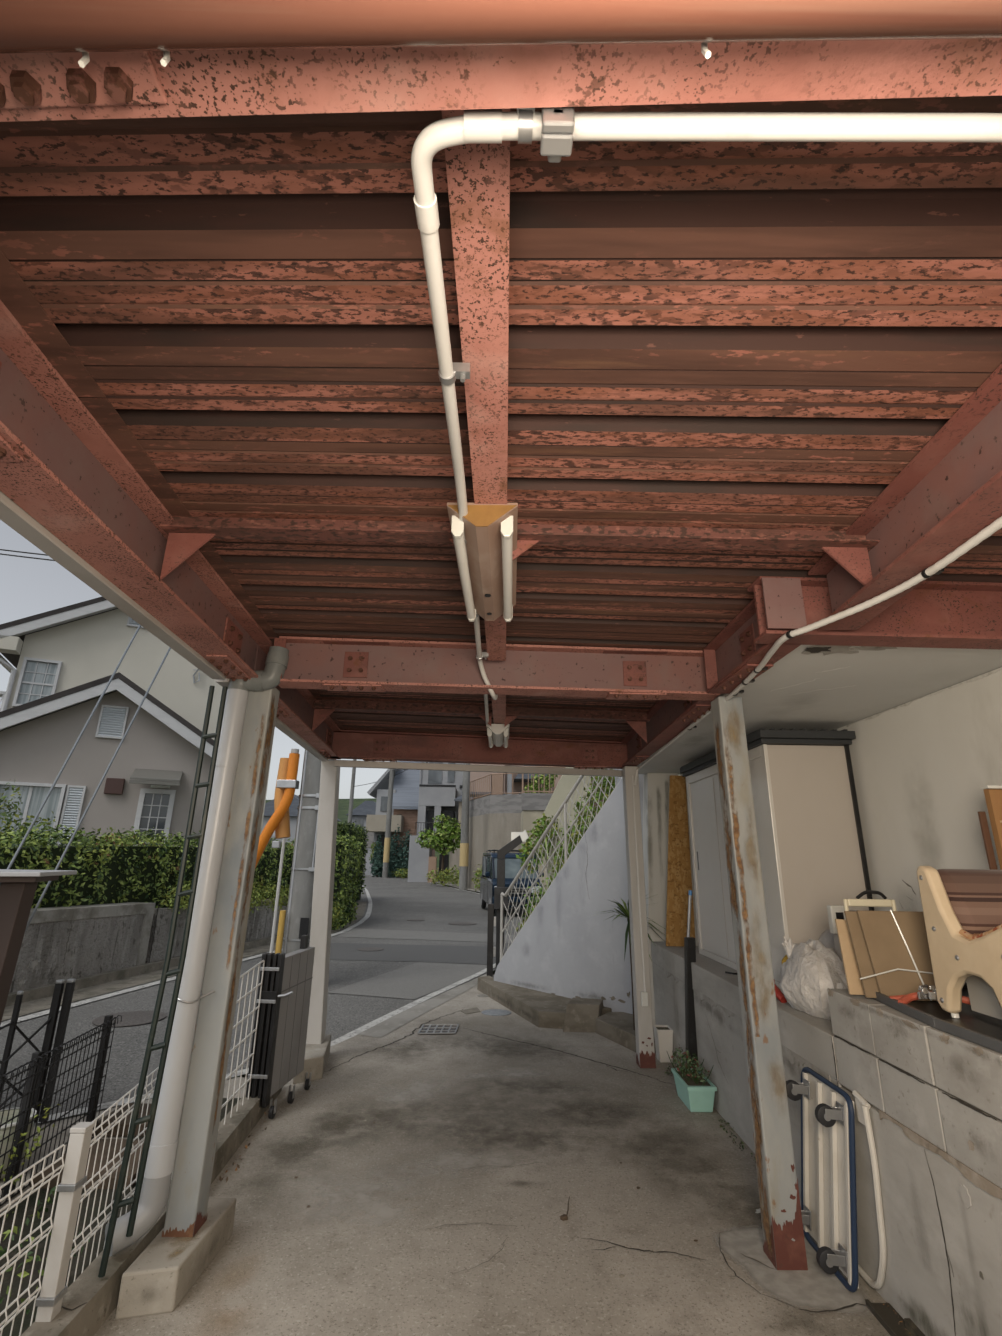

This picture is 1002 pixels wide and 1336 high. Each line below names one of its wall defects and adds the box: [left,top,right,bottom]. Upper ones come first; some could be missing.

rust [213,697,275,1127]
rust [716,718,772,1250]
rust [162,1213,208,1257]
crack [583,1236,867,1313]
crack [924,1149,956,1336]